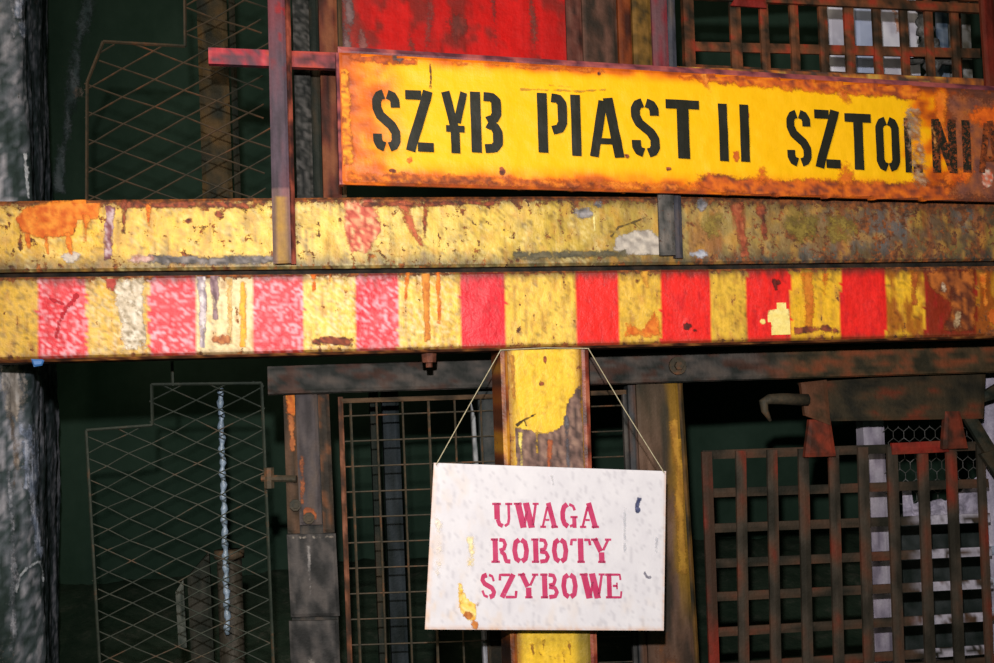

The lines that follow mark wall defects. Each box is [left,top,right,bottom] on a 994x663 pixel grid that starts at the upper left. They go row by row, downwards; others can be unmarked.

corrosion [341,0,994,257]
corrosion [16,200,100,255]
corrosion [118,201,257,226]
spalling [575,201,602,218]
spalling [614,230,659,255]
peeling [760,302,790,335]
corrosion [911,268,994,332]
peeling [515,386,584,468]
corrosion [286,394,317,520]